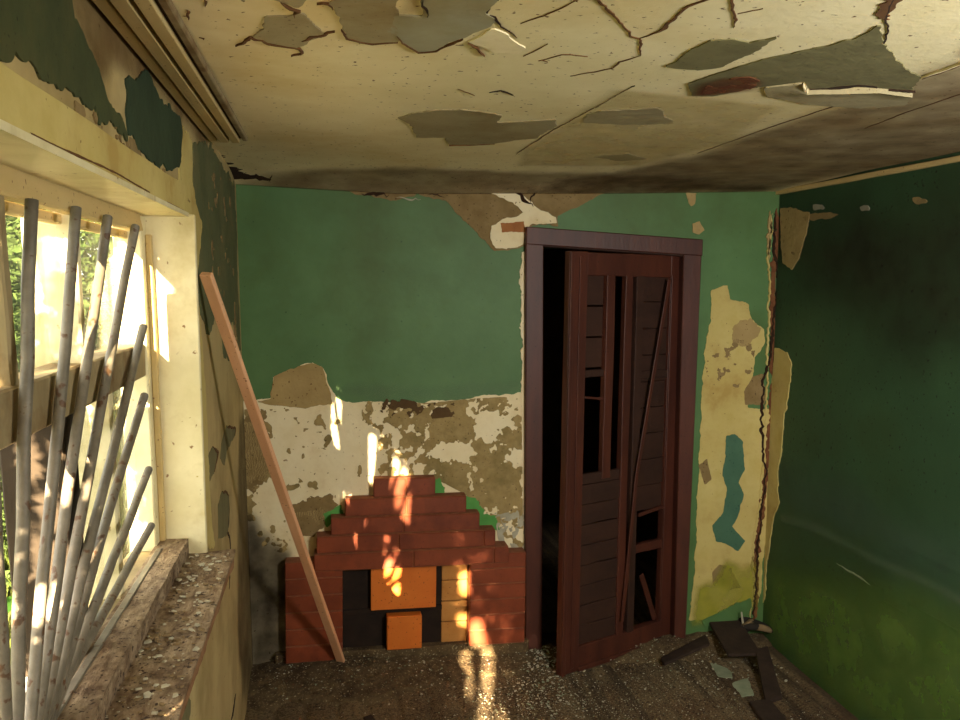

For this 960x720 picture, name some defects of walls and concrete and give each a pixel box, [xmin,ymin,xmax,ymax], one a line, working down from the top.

crack [458,88,514,96]
crack [486,0,763,77]
peeling [583,107,673,126]
peeling [666,25,921,109]
spalling [780,204,838,270]
peeling [0,0,604,557]
crack [749,208,779,619]
peeling [689,285,792,626]
flaking render [182,698,191,720]